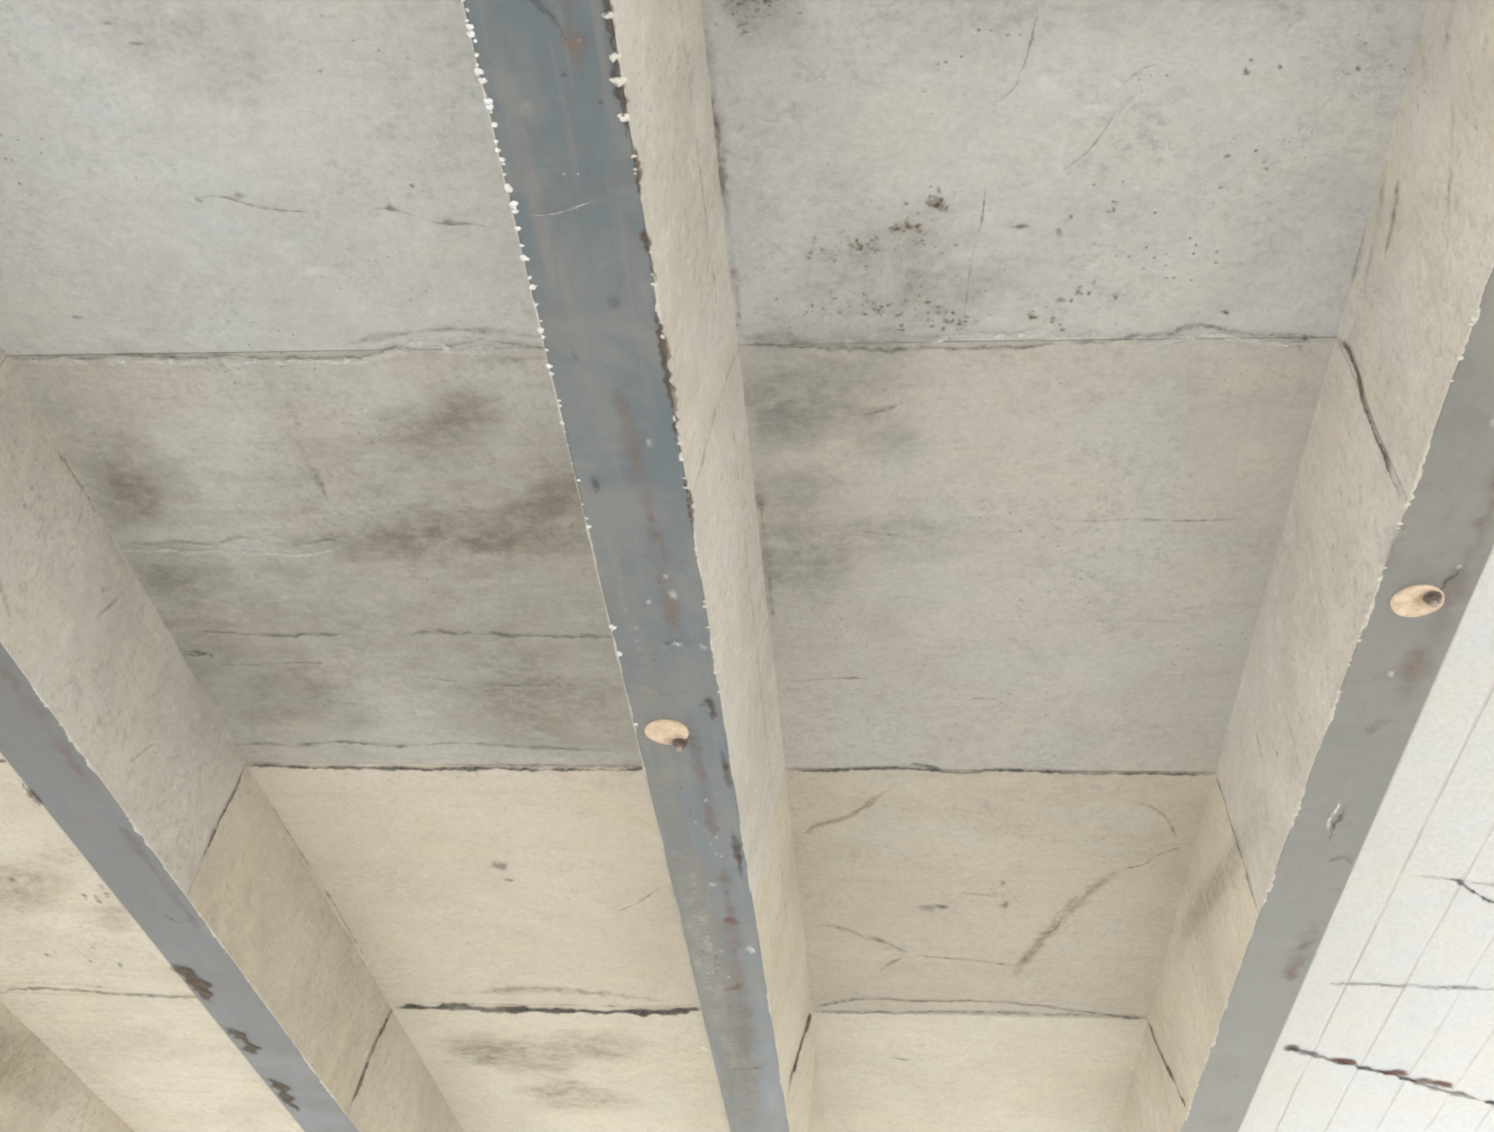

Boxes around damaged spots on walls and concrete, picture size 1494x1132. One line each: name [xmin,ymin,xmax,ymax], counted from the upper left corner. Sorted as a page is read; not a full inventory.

corrosion [604,0,628,126]
corrosion [634,149,642,193]
corrosion [641,232,656,276]
crack [854,333,1044,352]
corrosion [655,320,679,434]
crack [1101,326,1394,484]
corrosion [684,481,694,522]
crack [795,764,1255,903]
crack [1453,880,1494,903]
crack [1285,1045,1494,1104]